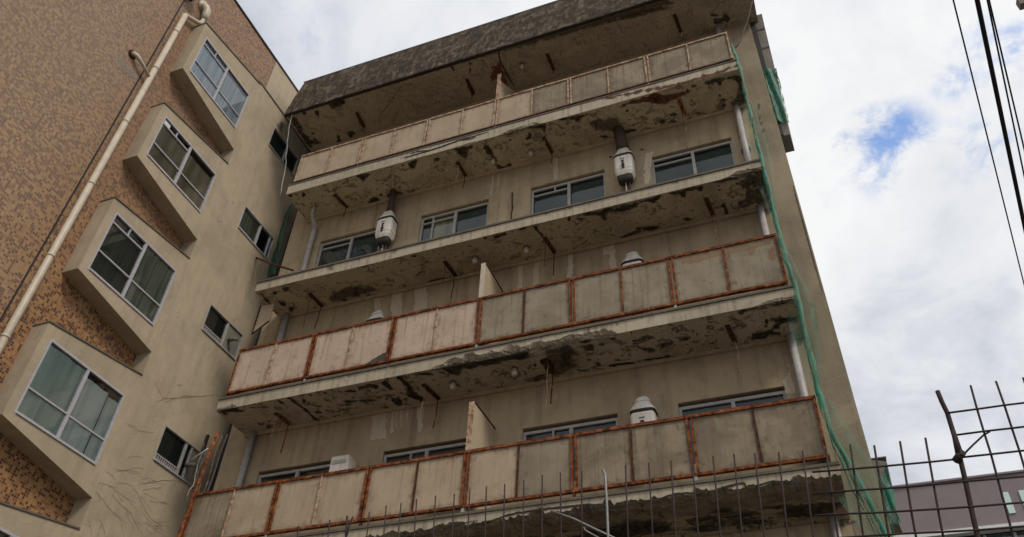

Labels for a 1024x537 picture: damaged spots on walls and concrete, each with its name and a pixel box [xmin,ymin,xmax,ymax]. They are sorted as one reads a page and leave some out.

corrosion [602,64,739,112]
peeling [655,75,746,124]
spalling [452,145,511,169]
spalling [736,295,798,341]
spalling [419,328,618,382]
peeling [633,333,698,353]
spalling [278,376,425,421]
crack [88,424,182,537]
spalling [365,474,845,537]